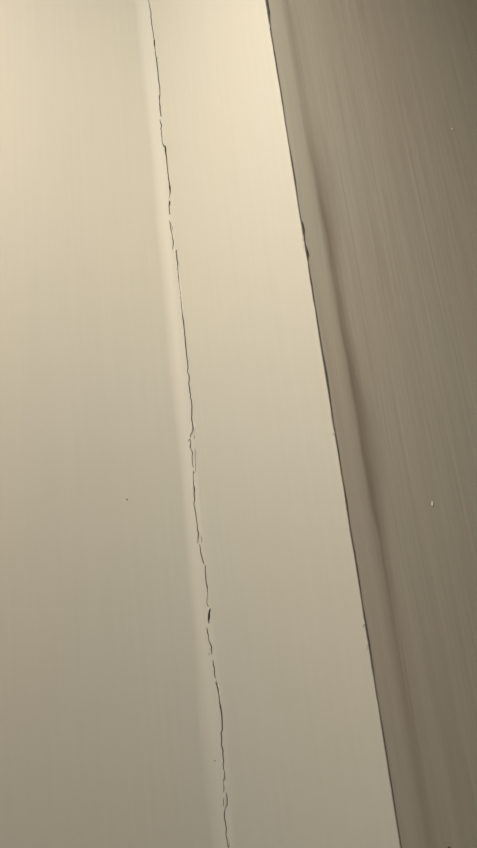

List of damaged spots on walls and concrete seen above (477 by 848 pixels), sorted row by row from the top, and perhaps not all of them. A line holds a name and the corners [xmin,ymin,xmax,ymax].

crack [148,0,229,847]